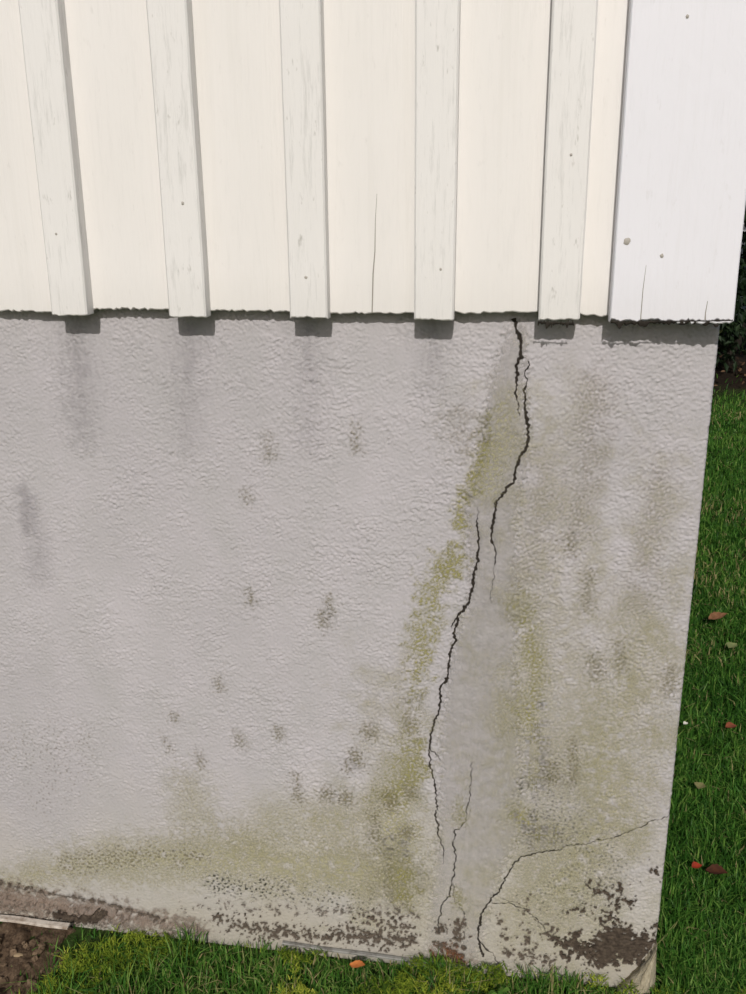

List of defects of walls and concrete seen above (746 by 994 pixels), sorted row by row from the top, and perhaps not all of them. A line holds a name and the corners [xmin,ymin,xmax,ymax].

crack [428,318,530,932]
crack [477,813,670,964]